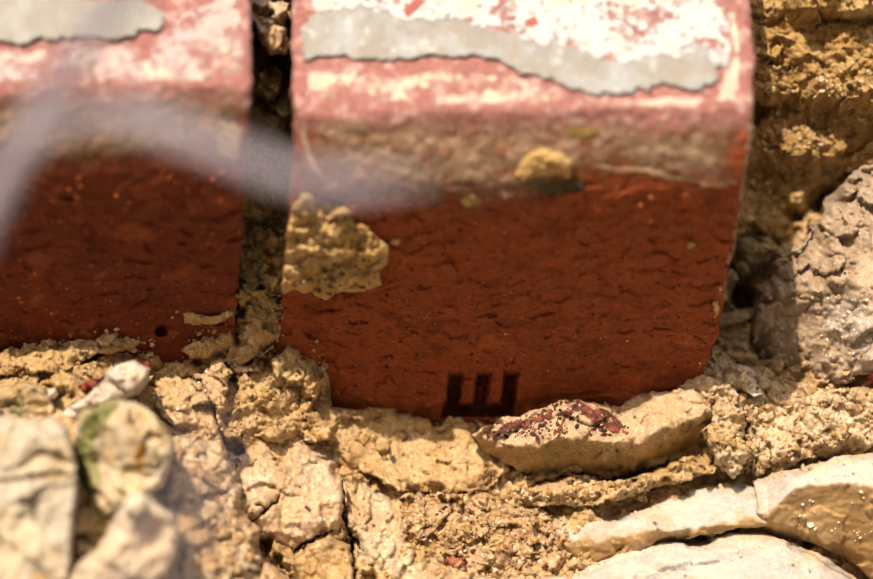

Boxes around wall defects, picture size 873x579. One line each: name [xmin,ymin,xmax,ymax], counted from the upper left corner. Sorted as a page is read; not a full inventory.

peeling [0,0,102,45]
peeling [106,0,165,41]
peeling [299,0,732,96]
spalling [37,126,178,159]
spalling [135,98,243,142]
spalling [301,118,737,202]
crack [251,496,280,524]
crack [294,484,364,579]